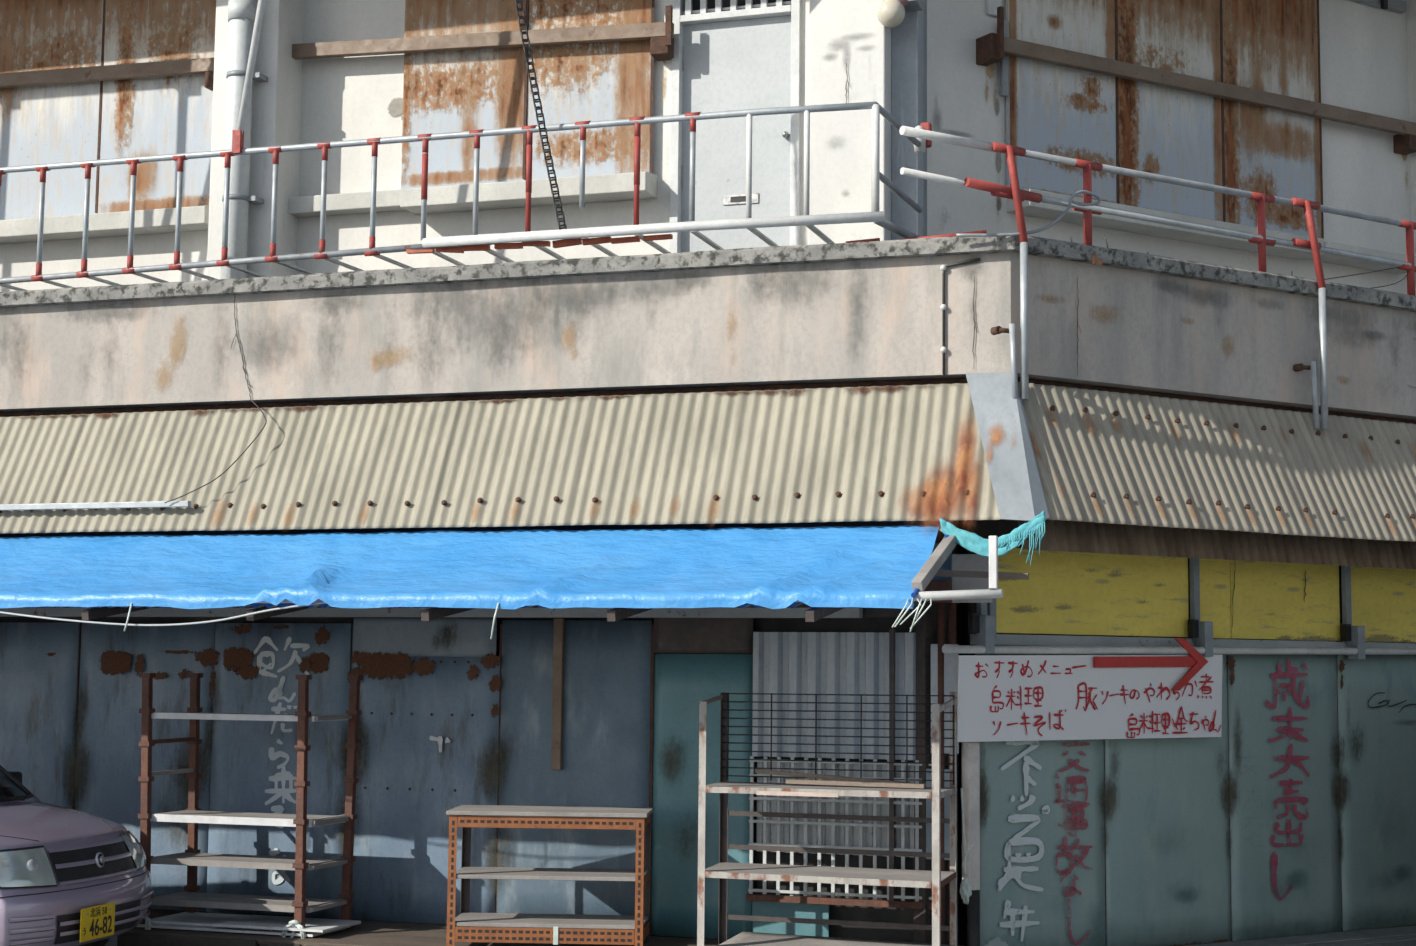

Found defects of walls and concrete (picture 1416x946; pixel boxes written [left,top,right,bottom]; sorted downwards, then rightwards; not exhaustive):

corrosion [0,0,216,148]
corrosion [402,0,665,186]
corrosion [985,56,1017,162]
corrosion [1041,0,1322,238]
corrosion [109,154,209,212]
corrosion [910,428,1001,523]
leakage [1223,722,1241,814]